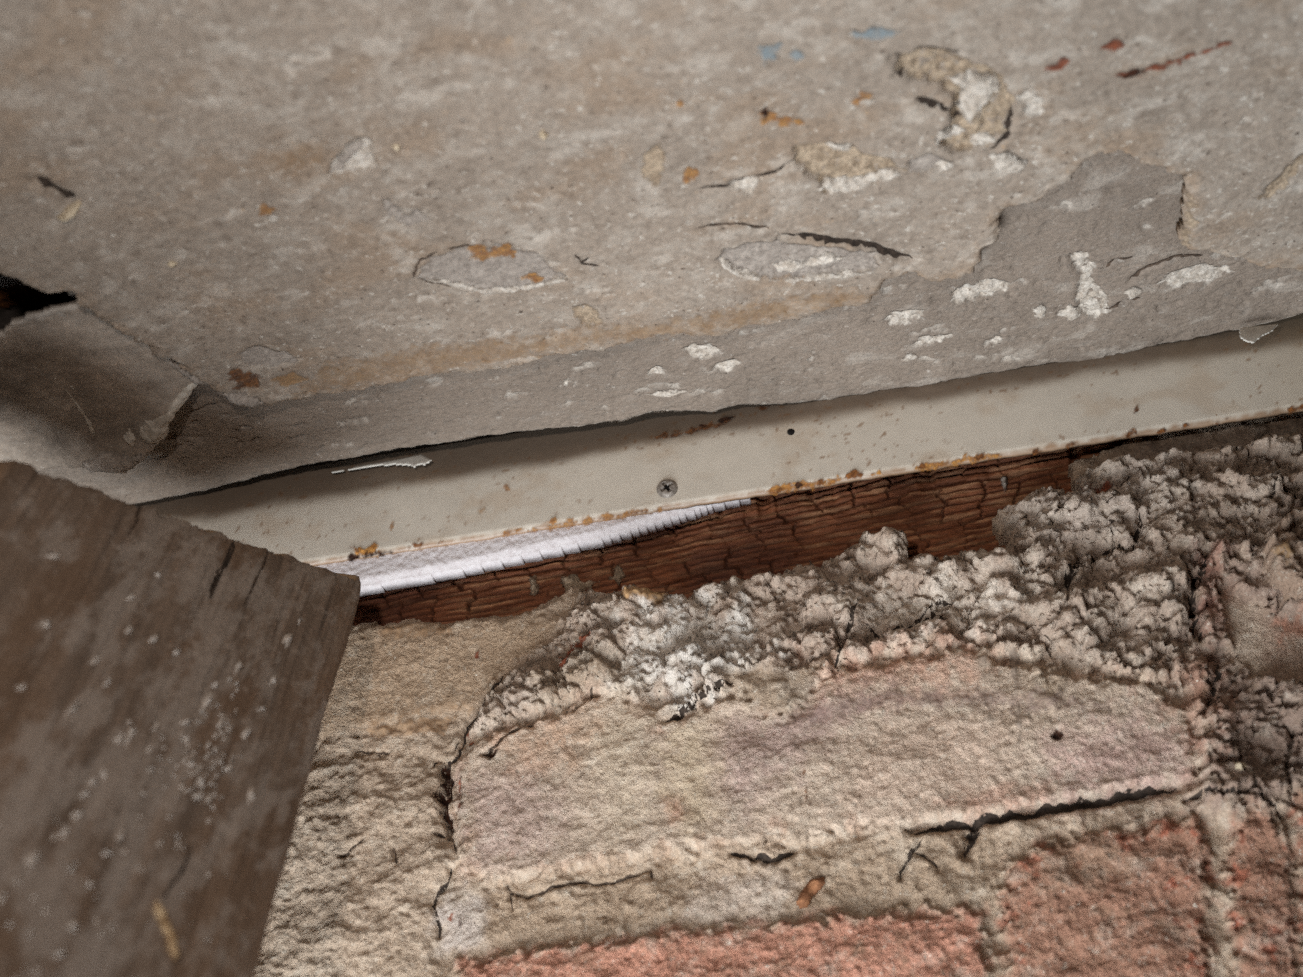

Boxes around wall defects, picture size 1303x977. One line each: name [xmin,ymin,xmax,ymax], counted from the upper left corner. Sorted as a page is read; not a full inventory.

flaking render [0,0,1303,407]
crack [699,223,913,259]
corrosion [0,282,67,307]
corrosion [915,453,1001,471]
corrosion [768,469,881,496]
corrosion [503,508,662,536]
corrosion [348,543,422,561]
crack [666,679,733,722]
crack [434,676,533,767]
crack [731,853,794,864]
crack [432,833,457,938]
crack [507,871,653,910]